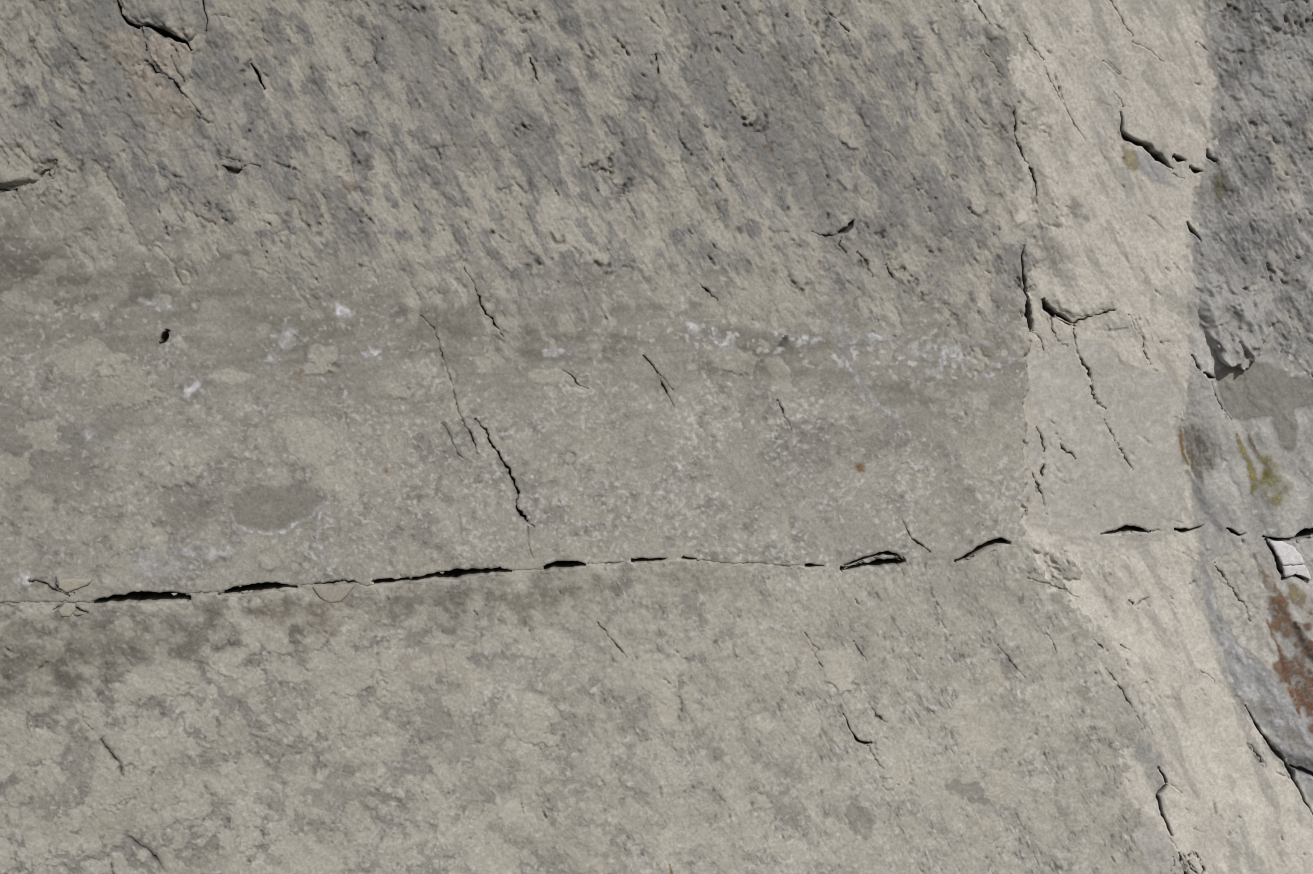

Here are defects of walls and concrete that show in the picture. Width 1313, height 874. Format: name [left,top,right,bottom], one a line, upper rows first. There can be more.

crack [1185,221,1203,242]
crack [1019,246,1152,470]
crack [1190,355,1232,421]
crack [0,314,1011,619]
crack [1030,427,1076,515]
crack [1028,576,1079,599]
crack [1100,523,1313,621]
crack [997,644,1027,680]
crack [1092,638,1147,729]
rust [1254,553,1313,732]
crack [1244,704,1313,818]
crack [1154,767,1207,874]